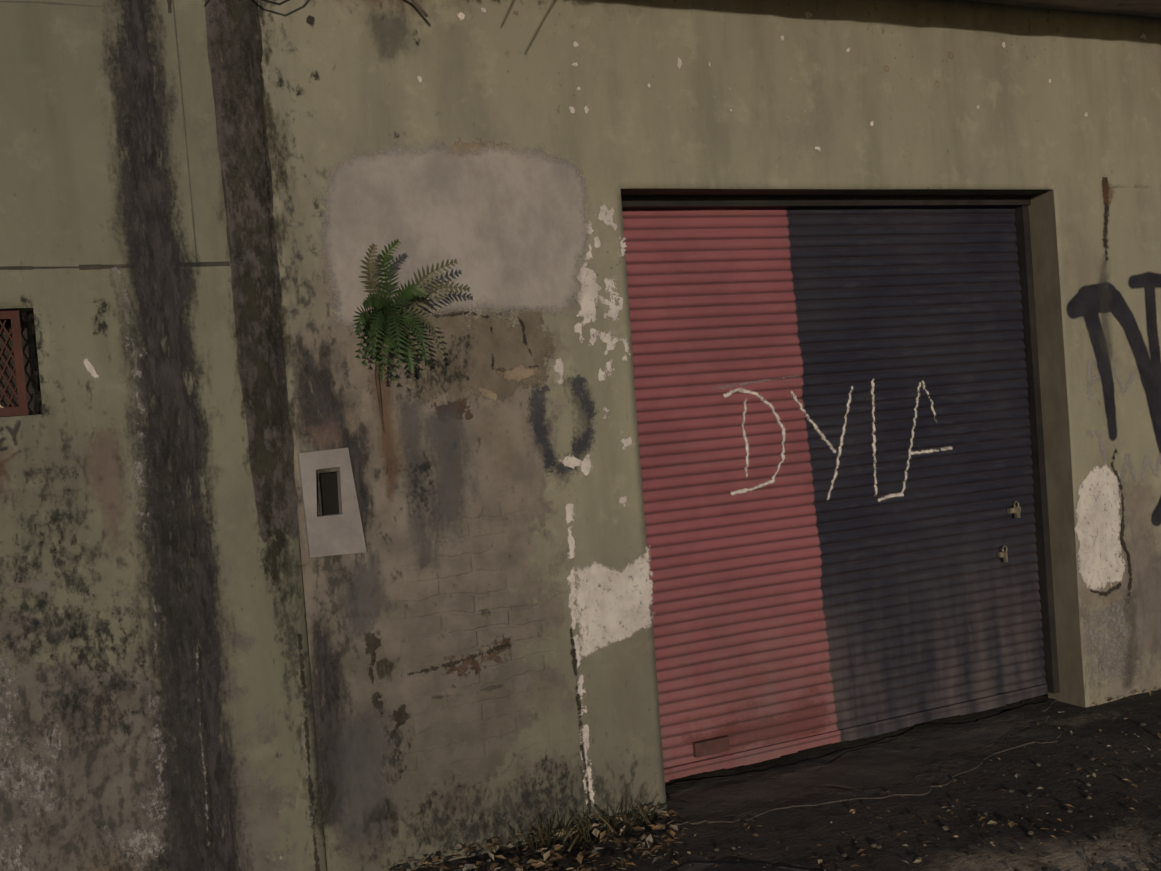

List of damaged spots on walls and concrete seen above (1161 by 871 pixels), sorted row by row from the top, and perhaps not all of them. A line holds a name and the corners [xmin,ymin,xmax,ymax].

leakage [2,0,242,871]
leakage [214,0,373,601]
leakage [402,405,461,562]
peeling [558,454,593,476]
peeling [574,203,630,381]
peeling [565,503,595,815]